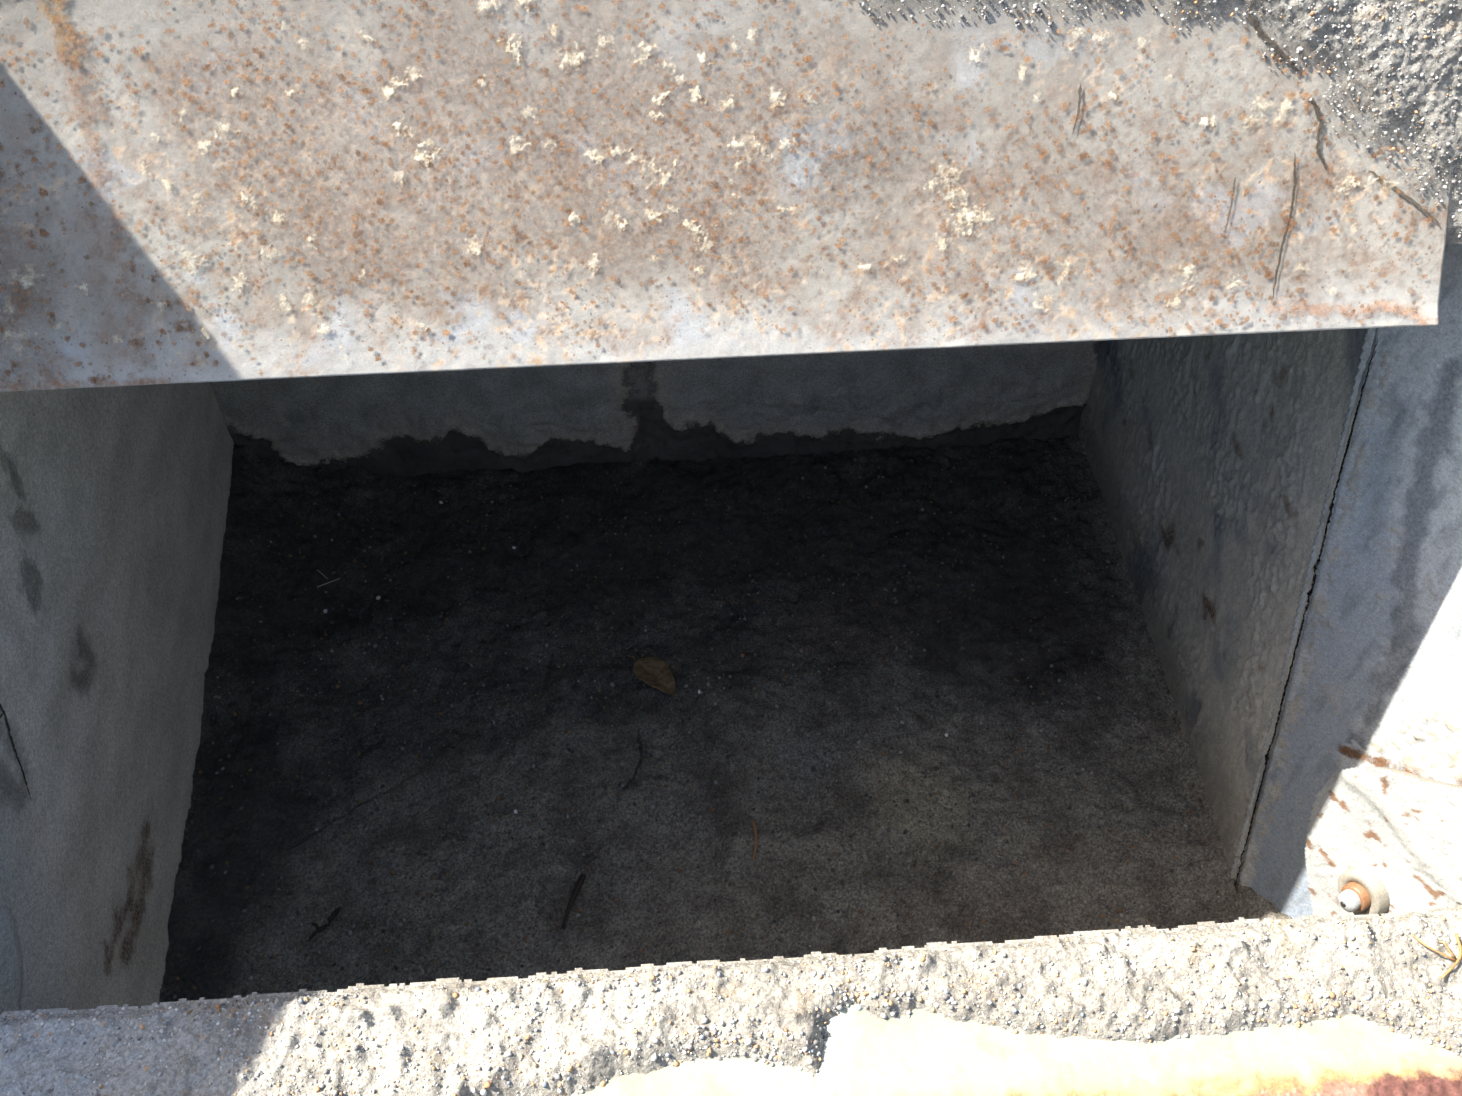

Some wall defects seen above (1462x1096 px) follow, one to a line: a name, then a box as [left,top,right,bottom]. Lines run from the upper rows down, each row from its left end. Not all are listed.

rust [38,0,97,119]
crack [1248,0,1327,303]
peeling [646,201,713,249]
crack [1369,171,1441,226]
rust [1235,1071,1462,1096]